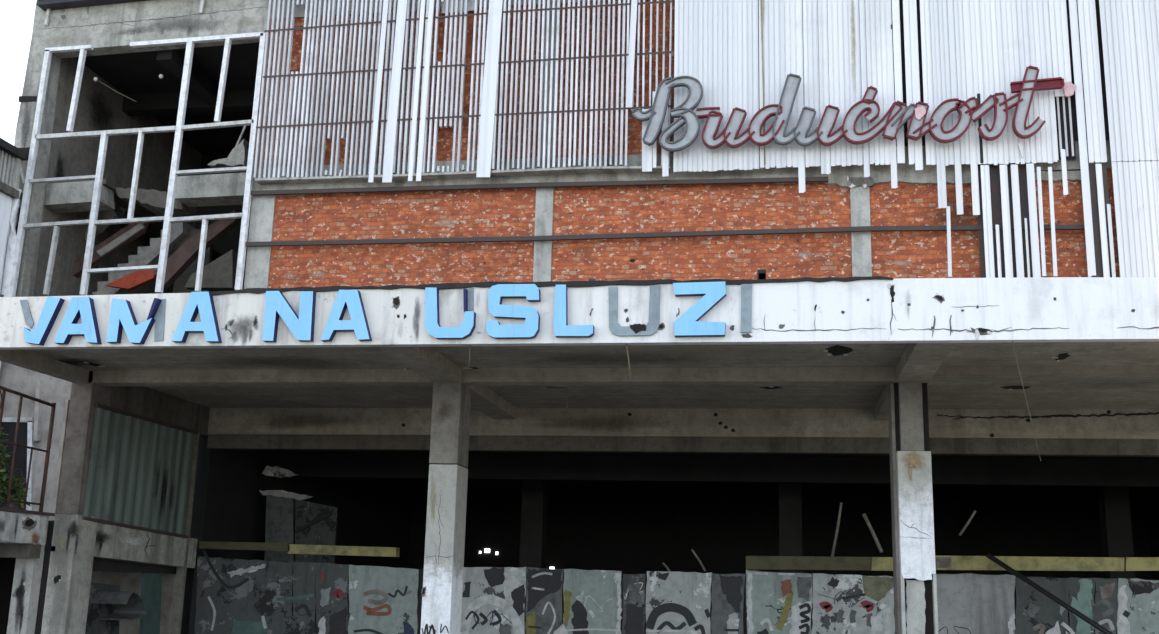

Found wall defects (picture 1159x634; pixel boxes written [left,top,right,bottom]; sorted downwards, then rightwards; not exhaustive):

leakage [225,317,258,341]
crack [752,299,1070,337]
crack [937,412,1159,420]